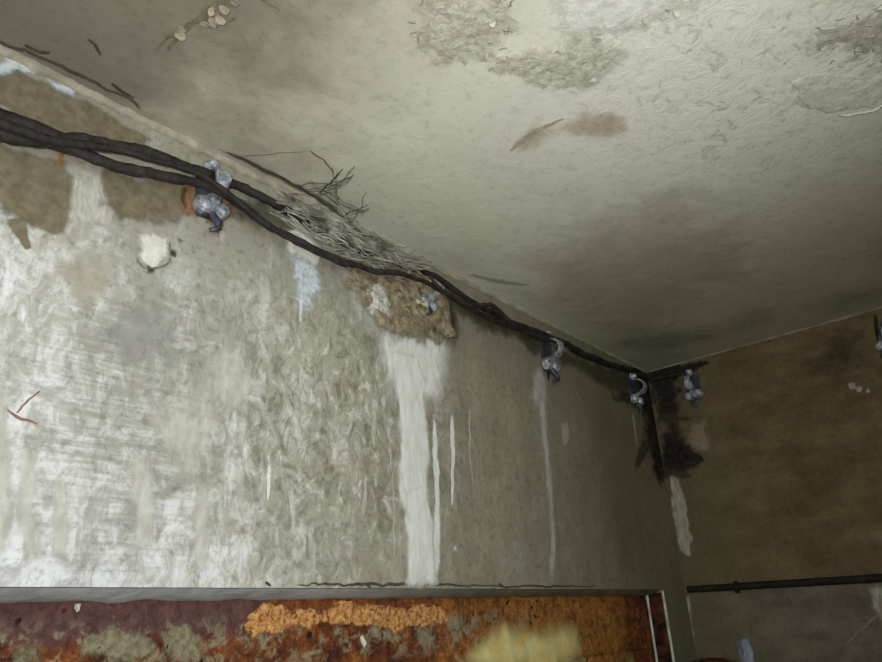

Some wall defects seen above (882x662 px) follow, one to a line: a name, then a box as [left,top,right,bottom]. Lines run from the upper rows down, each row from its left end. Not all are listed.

peeling [408,0,698,88]
spalling [793,5,882,117]
leakage [338,228,540,586]
leakage [561,350,708,556]
corrosion [244,600,449,639]
leakage [742,639,755,662]
crack [847,586,882,643]